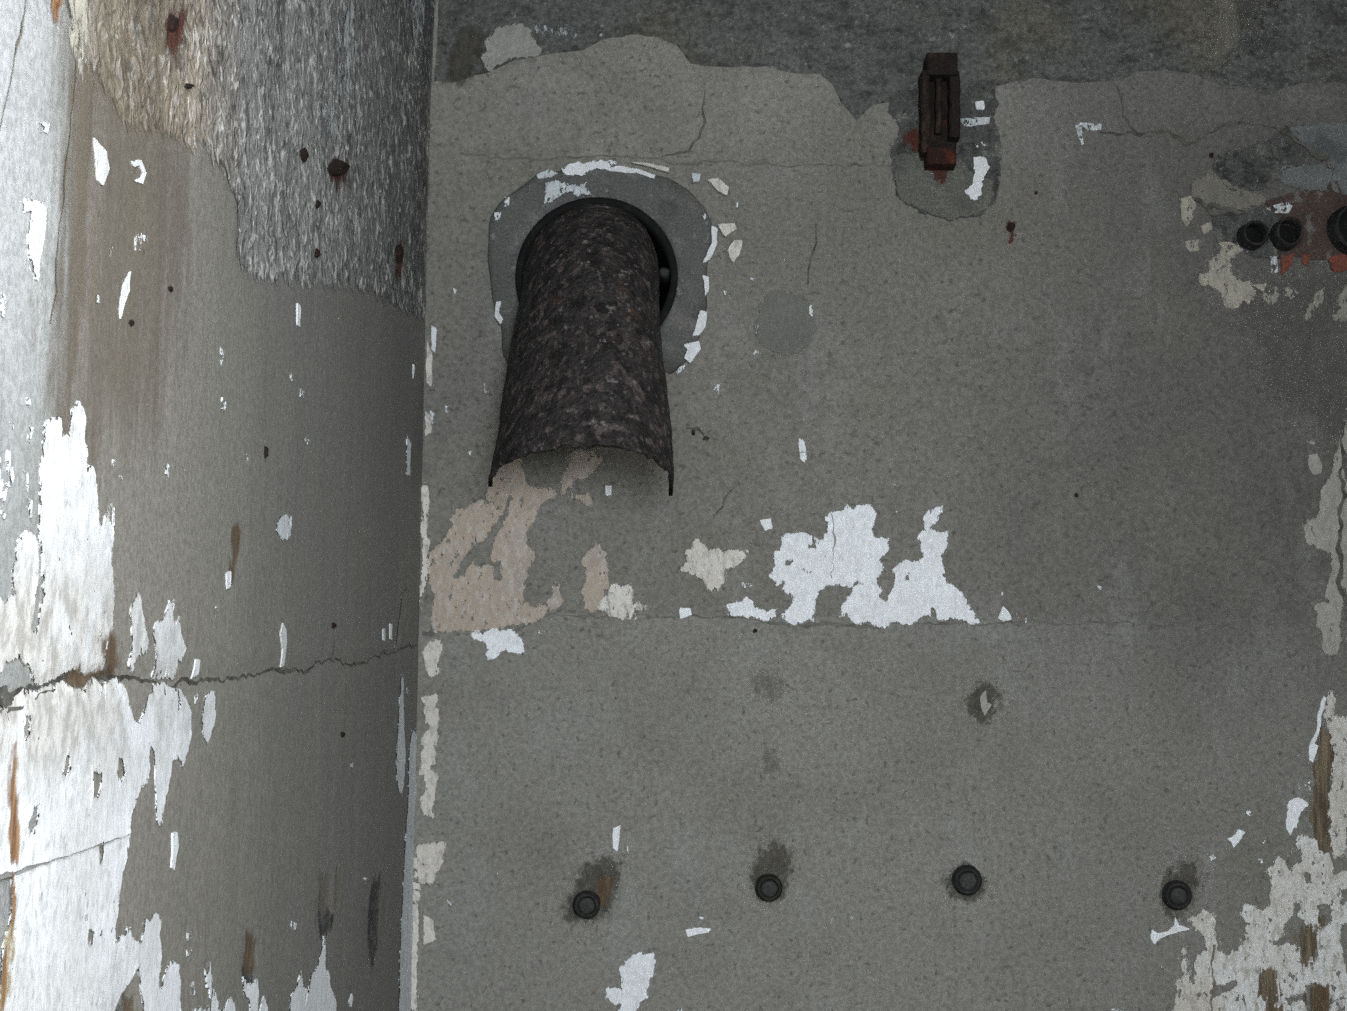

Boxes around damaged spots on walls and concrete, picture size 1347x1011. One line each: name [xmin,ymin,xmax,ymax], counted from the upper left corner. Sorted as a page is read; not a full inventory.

crack [0,0,27,129]
rust [52,0,62,23]
crack [50,23,81,324]
crack [461,93,892,168]
flaking render [63,0,1347,387]
peeling [0,401,268,1011]
peeling [382,435,612,677]
crack [0,420,1347,723]
peeling [679,504,980,629]
rust [0,742,20,1011]
crack [0,833,131,879]
peeling [1150,690,1347,1011]